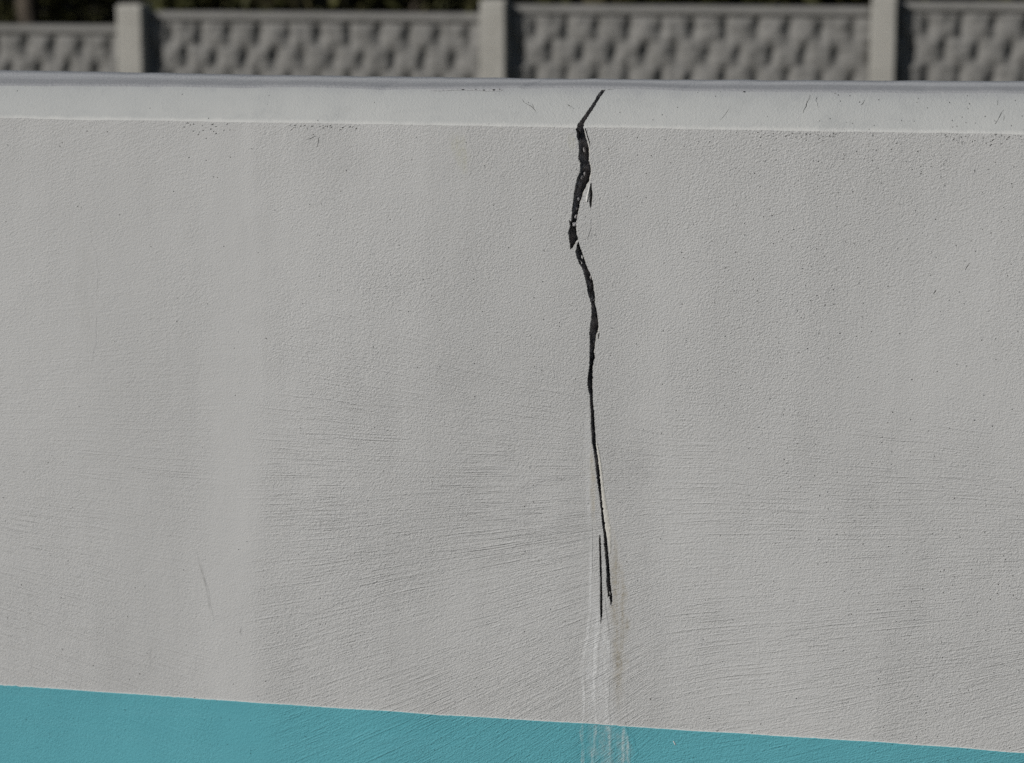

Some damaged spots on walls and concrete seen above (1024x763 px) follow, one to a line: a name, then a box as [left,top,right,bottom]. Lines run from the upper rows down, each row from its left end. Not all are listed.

crack [568,89,614,620]
leakage [574,406,638,763]